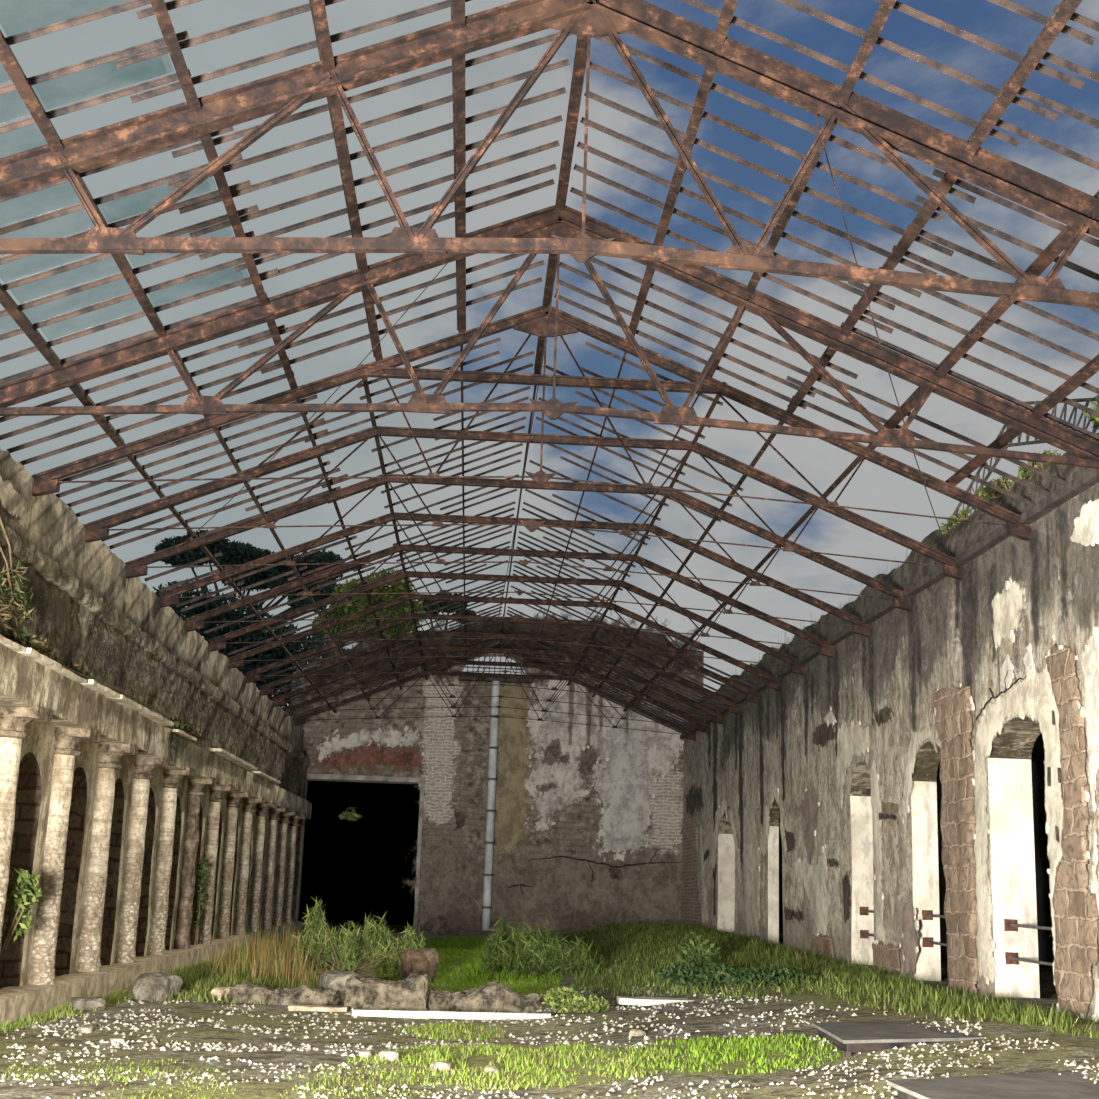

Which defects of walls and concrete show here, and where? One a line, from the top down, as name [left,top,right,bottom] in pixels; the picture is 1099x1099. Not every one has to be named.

flaking render [414,677,464,825]
damp [707,469,1099,870]
flaking render [931,626,1099,1022]